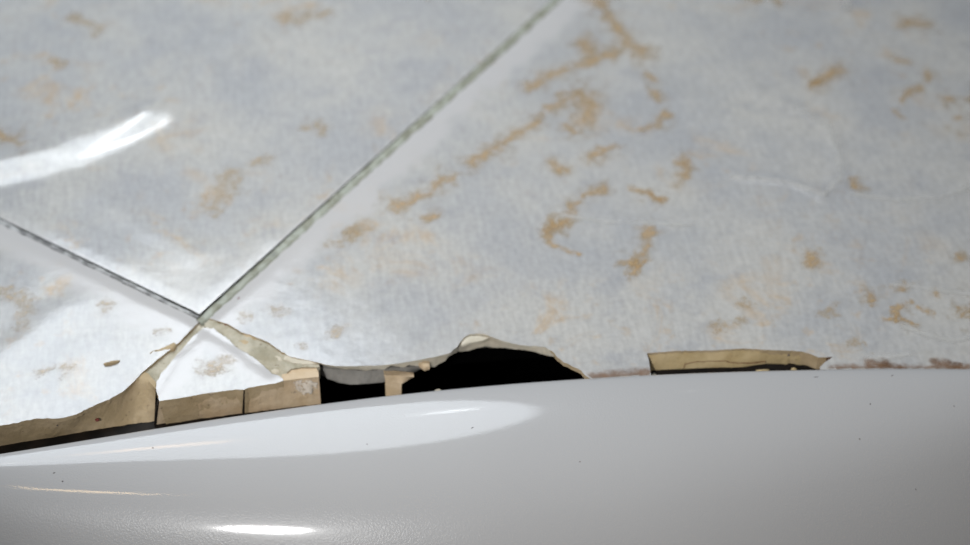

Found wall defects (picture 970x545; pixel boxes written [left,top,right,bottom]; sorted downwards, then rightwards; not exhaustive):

spalling [0,372,165,446]
spalling [197,335,554,418]
peeling [647,350,816,375]
rust [836,361,901,369]